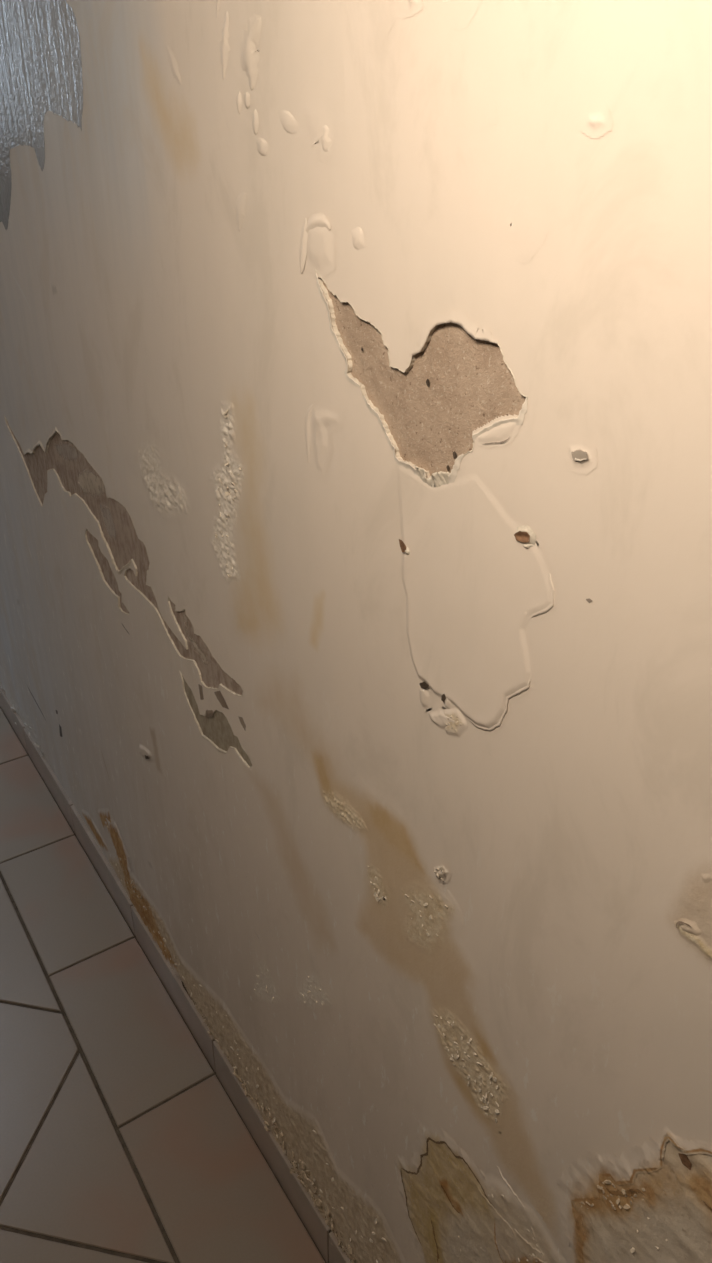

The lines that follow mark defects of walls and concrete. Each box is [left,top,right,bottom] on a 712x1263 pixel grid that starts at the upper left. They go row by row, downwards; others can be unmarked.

peeling [315,270,528,488]
peeling [4,415,252,768]
damp [207,358,712,1263]